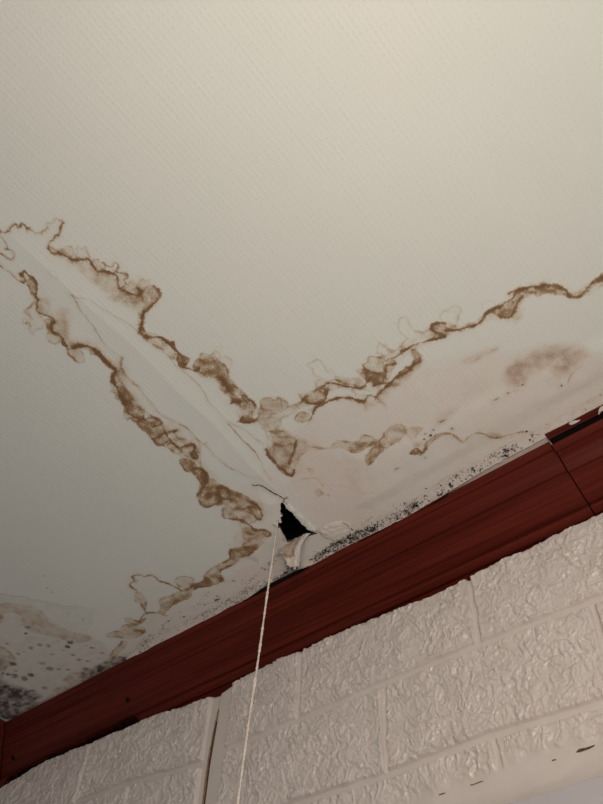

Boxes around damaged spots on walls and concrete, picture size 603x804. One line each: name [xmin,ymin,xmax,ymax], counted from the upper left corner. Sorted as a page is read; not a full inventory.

damp [0,215,603,721]